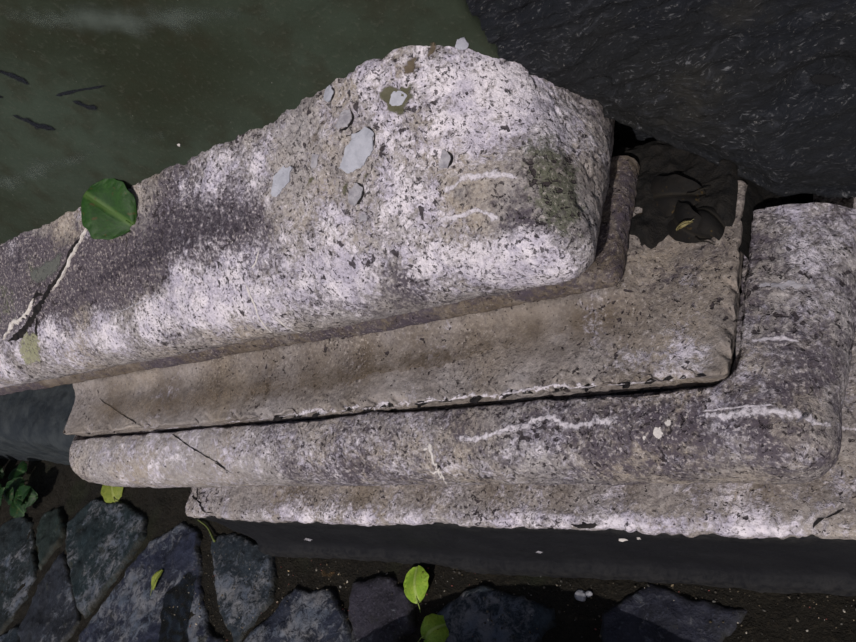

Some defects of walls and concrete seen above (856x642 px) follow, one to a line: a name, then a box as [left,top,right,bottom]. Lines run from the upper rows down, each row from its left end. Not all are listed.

spalling [404,57,416,74]
peeling [324,85,335,102]
peeling [389,91,407,106]
peeling [334,109,375,222]
peeling [439,150,453,169]
peeling [271,166,293,197]
crack [2,228,87,342]
leakage [459,414,618,442]
leakage [702,404,831,426]
crack [171,433,233,474]